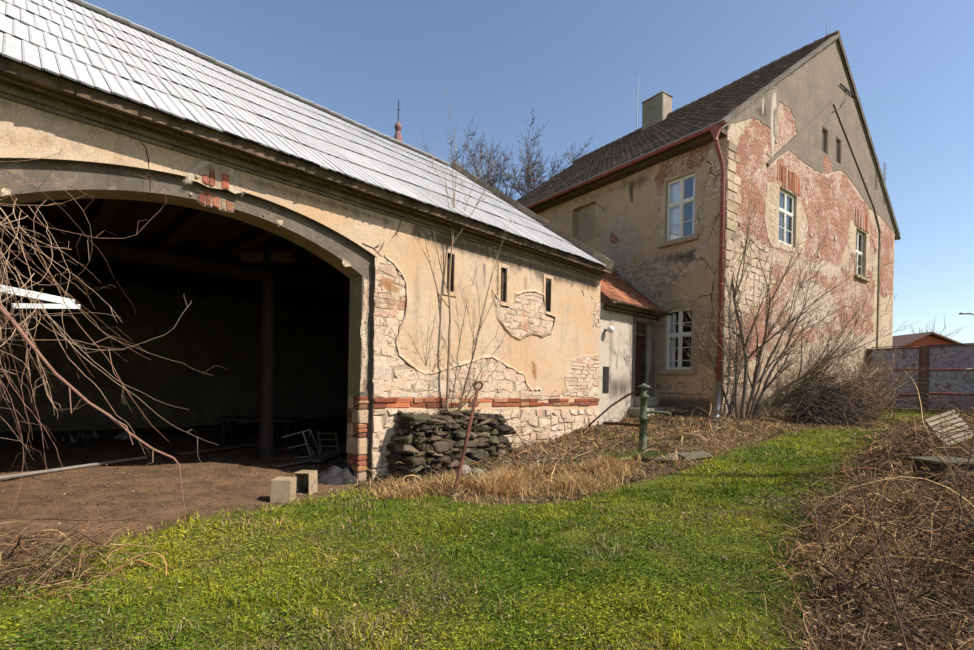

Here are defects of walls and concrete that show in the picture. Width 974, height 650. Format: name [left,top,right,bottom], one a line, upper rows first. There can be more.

spalling [190,158,244,213]
peeling [360,254,600,482]
peeling [593,300,619,354]
peeling [631,104,894,366]